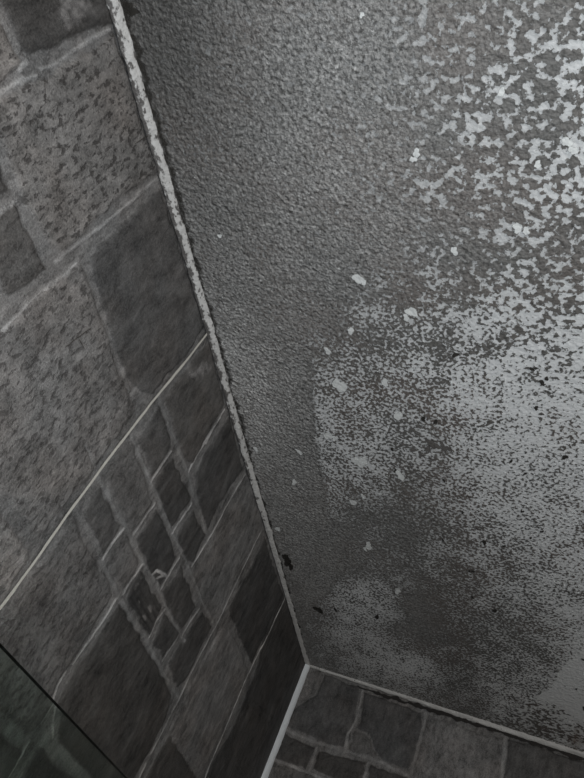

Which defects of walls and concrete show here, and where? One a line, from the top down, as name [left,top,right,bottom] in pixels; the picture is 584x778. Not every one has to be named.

leakage [120,0,584,761]